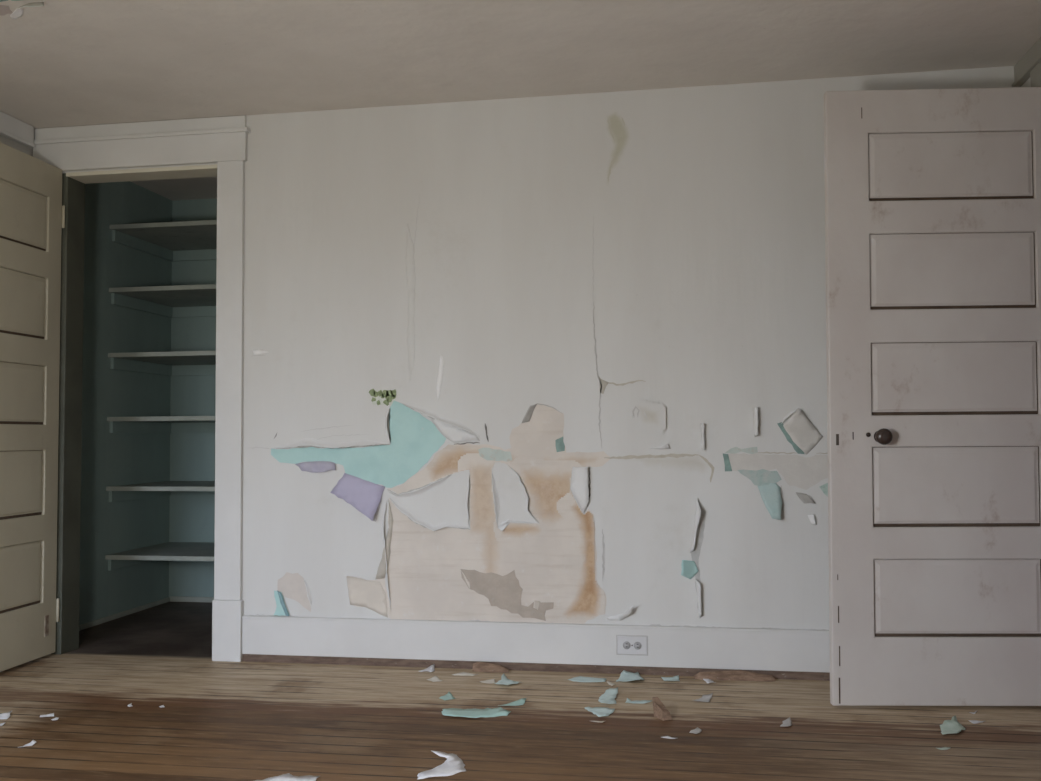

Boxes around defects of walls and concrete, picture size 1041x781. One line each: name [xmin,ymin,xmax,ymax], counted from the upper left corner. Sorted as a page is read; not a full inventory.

crack [592,216,646,447]
flaking render [271,401,575,623]
damp [420,444,607,624]
flaking render [570,451,633,624]
peeling [681,498,706,618]
peeling [723,407,828,525]